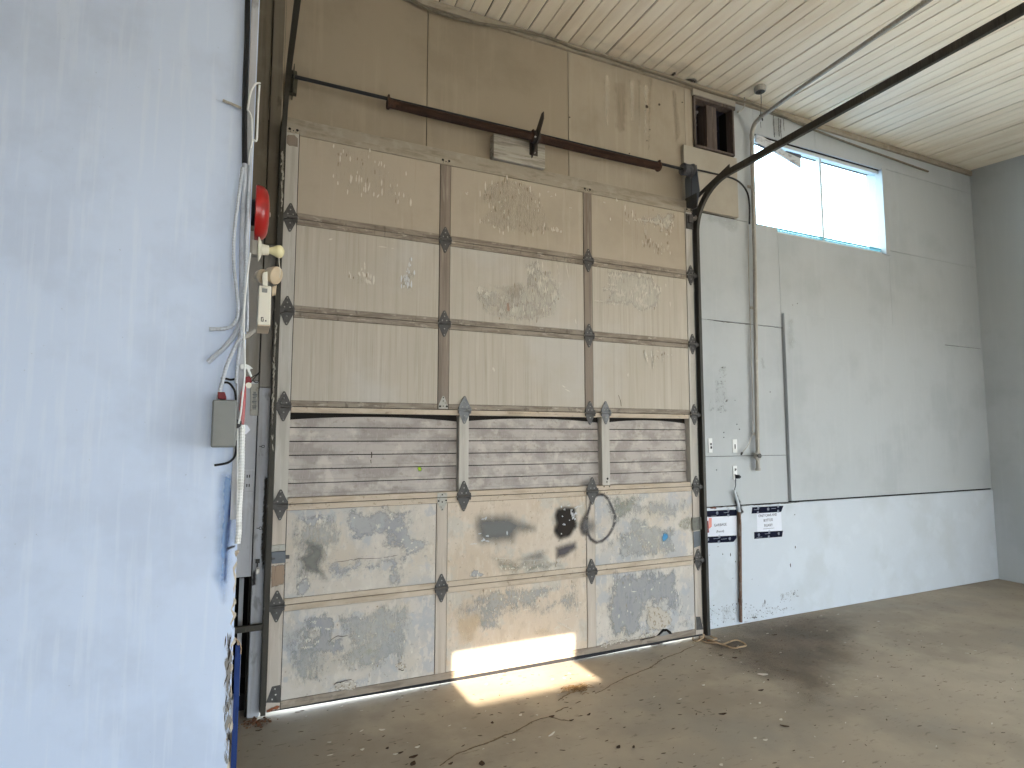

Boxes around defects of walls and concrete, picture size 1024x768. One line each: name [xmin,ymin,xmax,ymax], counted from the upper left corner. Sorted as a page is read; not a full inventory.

peeling [332,507,425,583]
spalling [223,577,252,764]
peeling [301,614,343,657]
peeling [601,571,679,648]